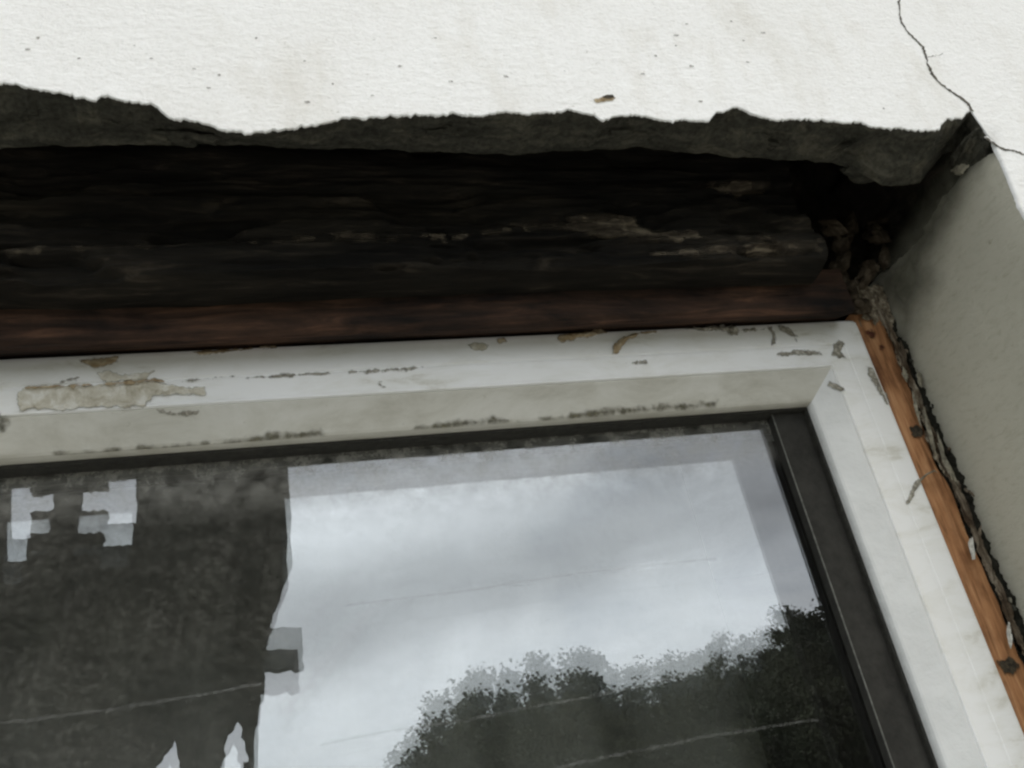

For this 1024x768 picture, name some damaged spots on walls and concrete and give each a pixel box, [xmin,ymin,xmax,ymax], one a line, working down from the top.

crack [897,0,974,111]
crack [985,136,1024,155]
flaking render [0,84,1024,655]